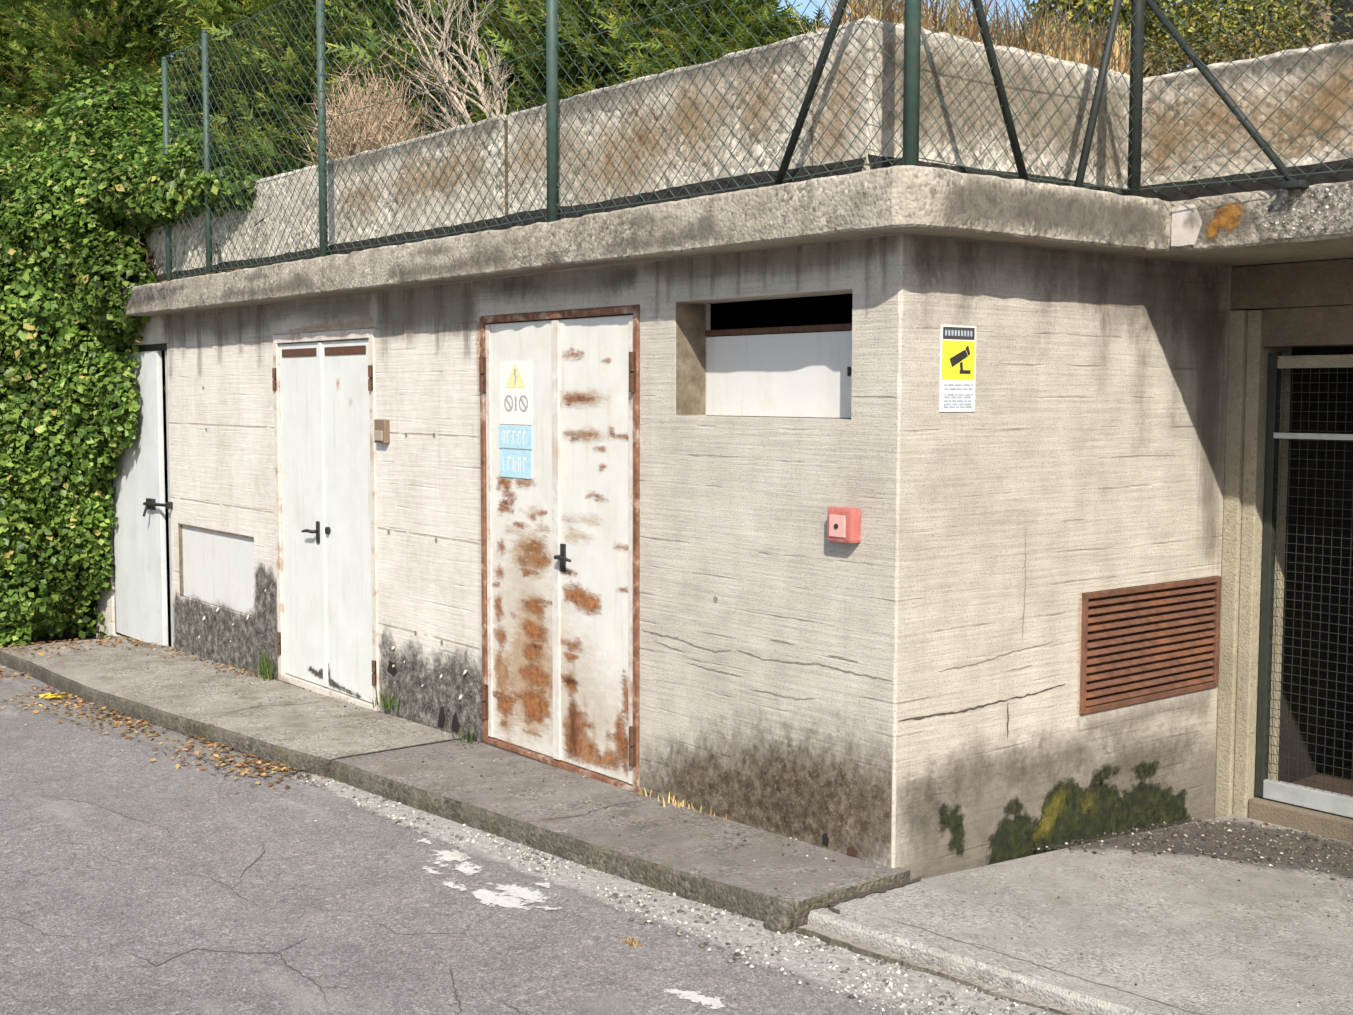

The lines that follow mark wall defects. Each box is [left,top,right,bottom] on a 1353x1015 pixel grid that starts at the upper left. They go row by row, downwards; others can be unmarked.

rust [565,394,597,405]
rust [568,427,628,471]
rust [498,477,550,576]
rust [492,569,628,770]
crack [643,630,892,700]
crack [900,536,1065,739]
damp [640,737,892,859]
damp [915,750,1216,879]